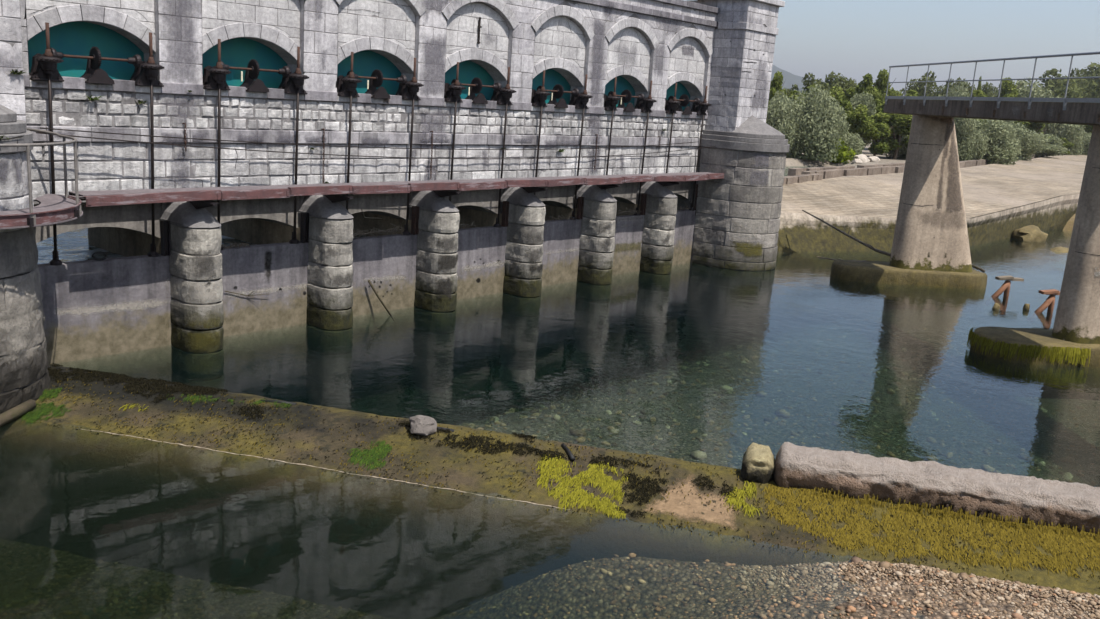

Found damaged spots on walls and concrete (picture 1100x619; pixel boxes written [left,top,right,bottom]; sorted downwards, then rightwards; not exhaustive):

leakage [937,122,962,212]